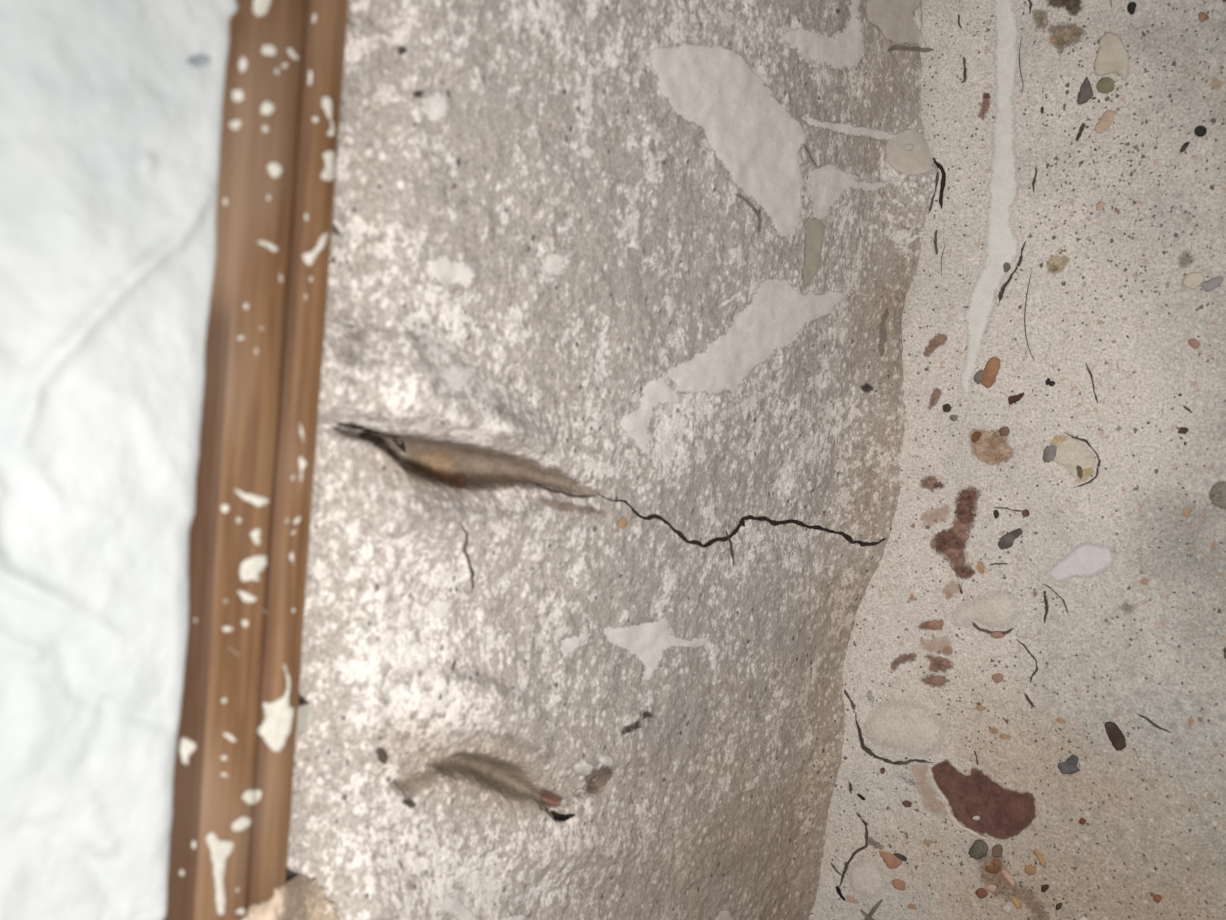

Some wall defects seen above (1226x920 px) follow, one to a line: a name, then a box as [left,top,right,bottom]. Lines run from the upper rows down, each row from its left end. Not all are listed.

peeling [775,0,934,71]
peeling [618,42,901,454]
crack [460,523,475,593]
crack [534,483,886,565]
spalling [241,874,340,920]